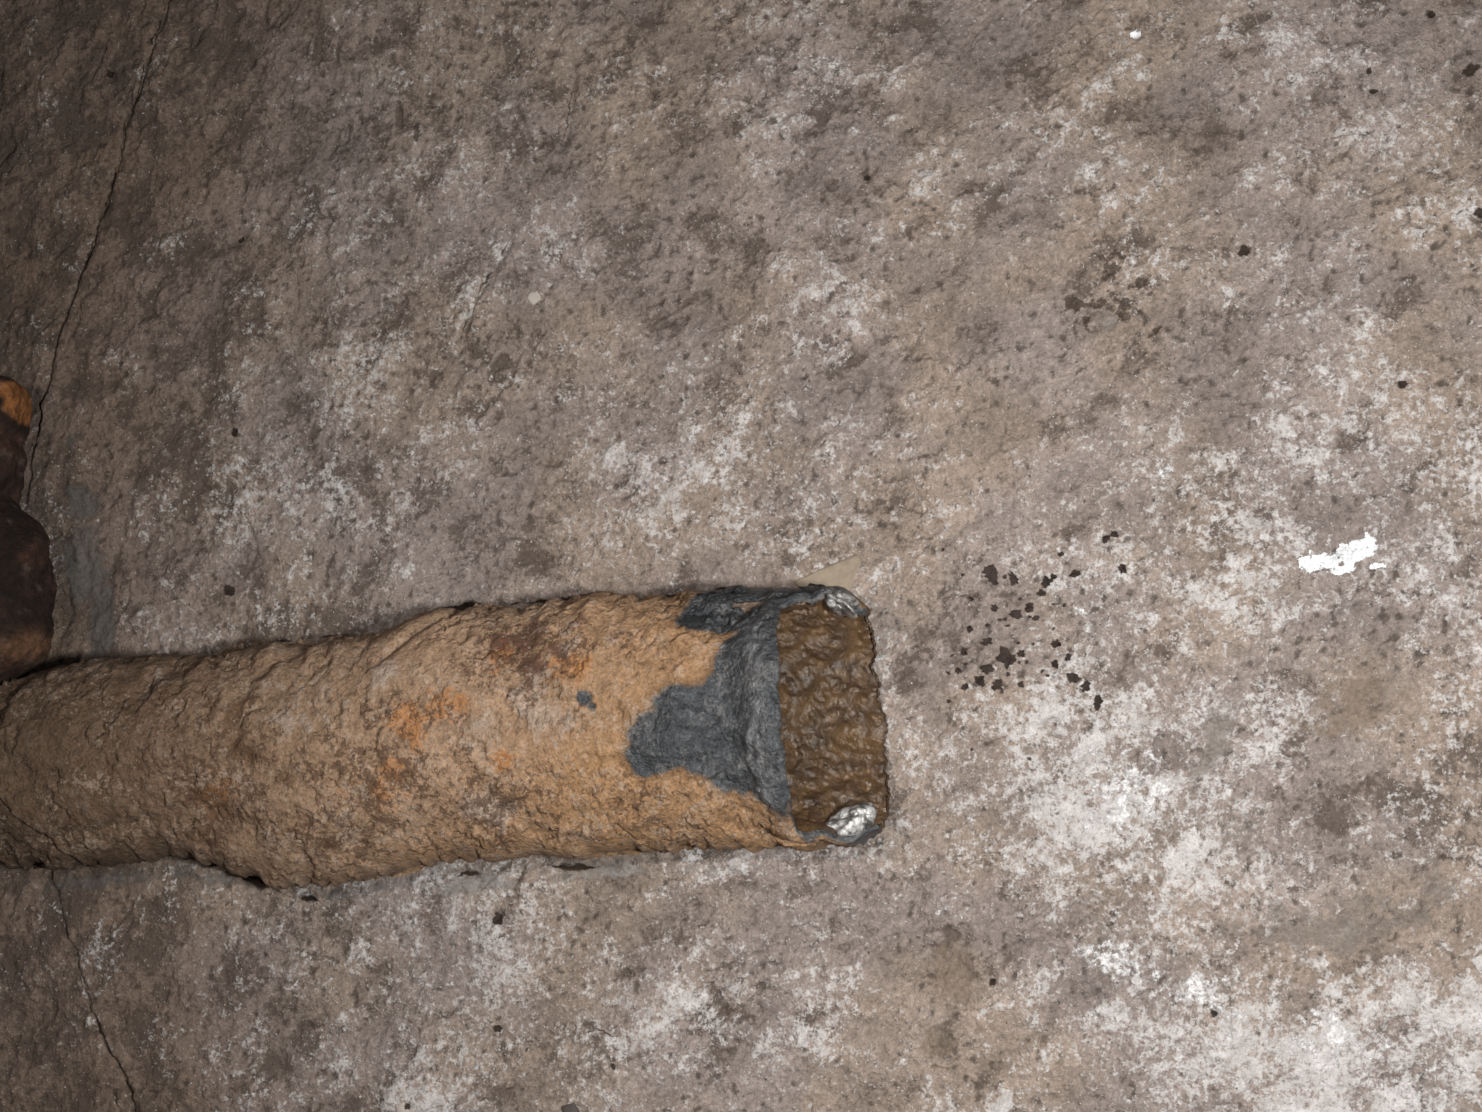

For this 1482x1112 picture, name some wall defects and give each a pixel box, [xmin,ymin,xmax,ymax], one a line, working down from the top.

crack [55,1,168,264]